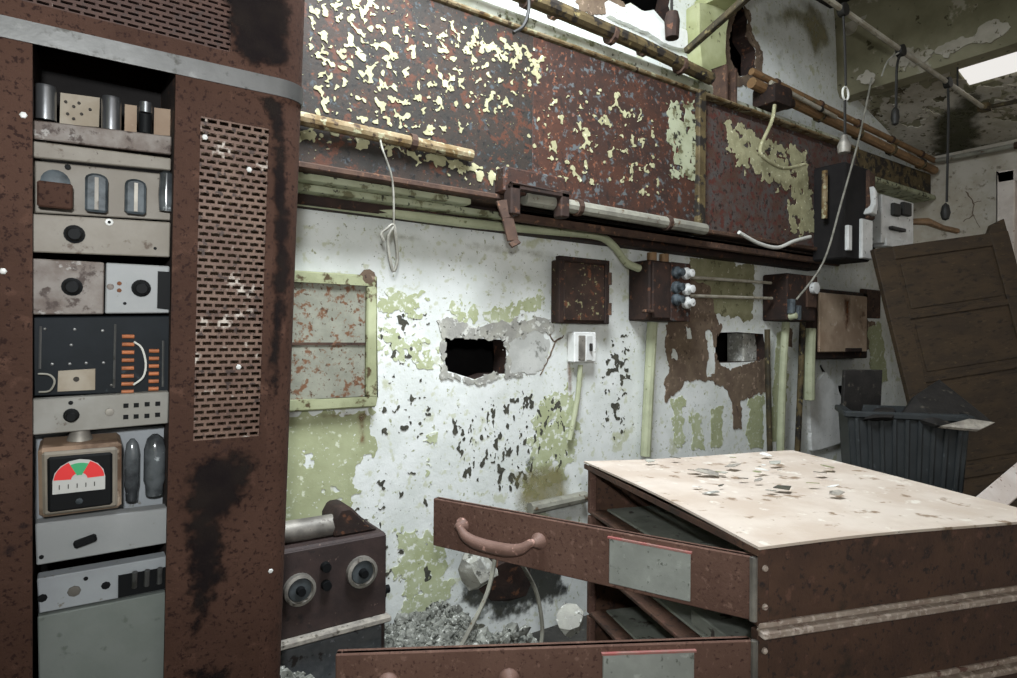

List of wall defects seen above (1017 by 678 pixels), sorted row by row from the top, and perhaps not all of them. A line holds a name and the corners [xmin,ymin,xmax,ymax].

flaking render [575,0,625,15]
flaking render [725,6,764,87]
peeling [856,70,875,85]
peeling [877,72,1017,159]
peeling [889,19,1011,71]
flaking render [377,287,555,385]
peeling [602,334,631,440]
flaking render [664,257,793,451]
peeling [867,319,888,383]
peeling [286,382,581,521]
peeling [386,526,456,615]